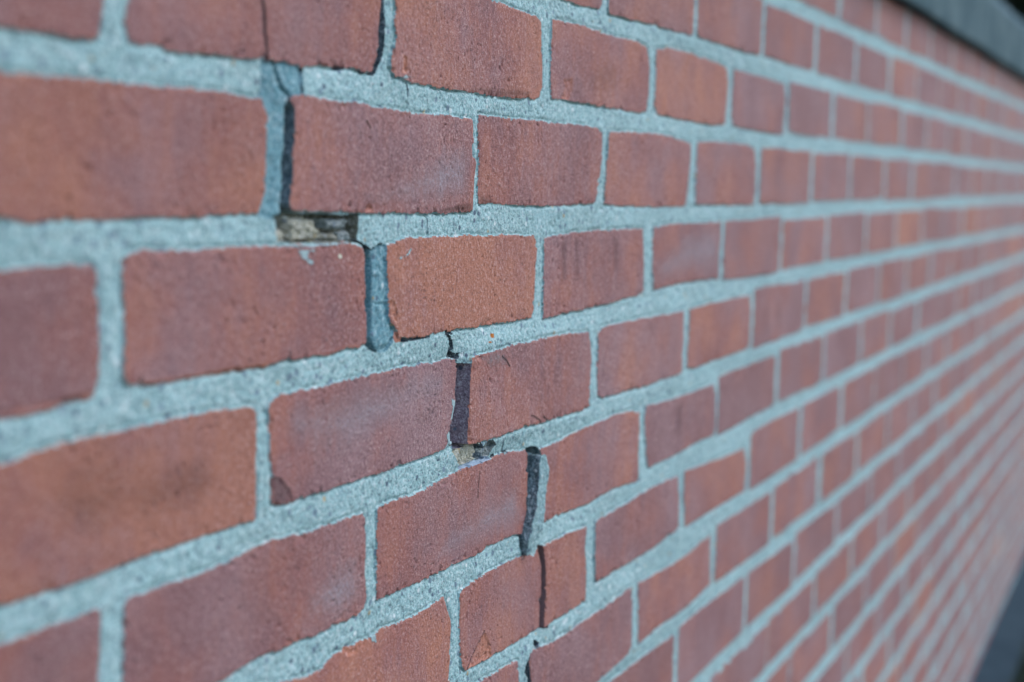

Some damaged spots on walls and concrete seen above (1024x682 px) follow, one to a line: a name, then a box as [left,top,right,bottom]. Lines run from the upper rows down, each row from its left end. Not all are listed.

crack [261,0,306,211]
spalling [272,203,373,264]
crack [353,240,382,249]
crack [364,330,548,498]
crack [519,534,548,682]